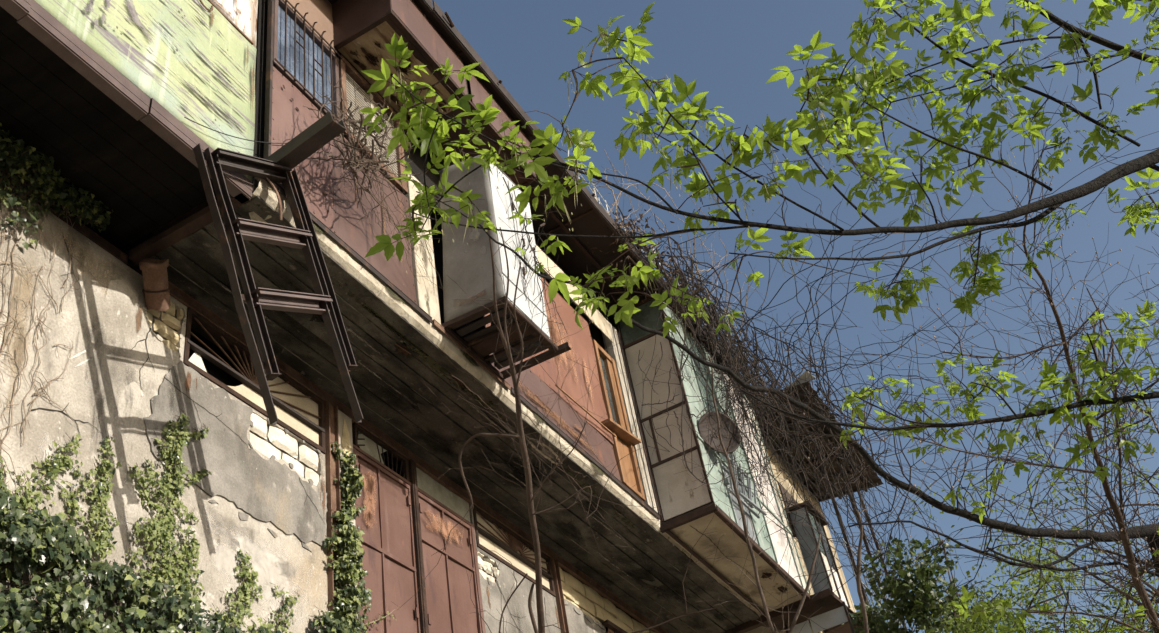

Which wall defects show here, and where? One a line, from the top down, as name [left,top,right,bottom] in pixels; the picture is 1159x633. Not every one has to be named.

leakage [265,271,303,293]
leakage [262,309,333,352]
crack [132,328,249,449]
peeling [140,287,327,552]
rust [426,511,462,543]